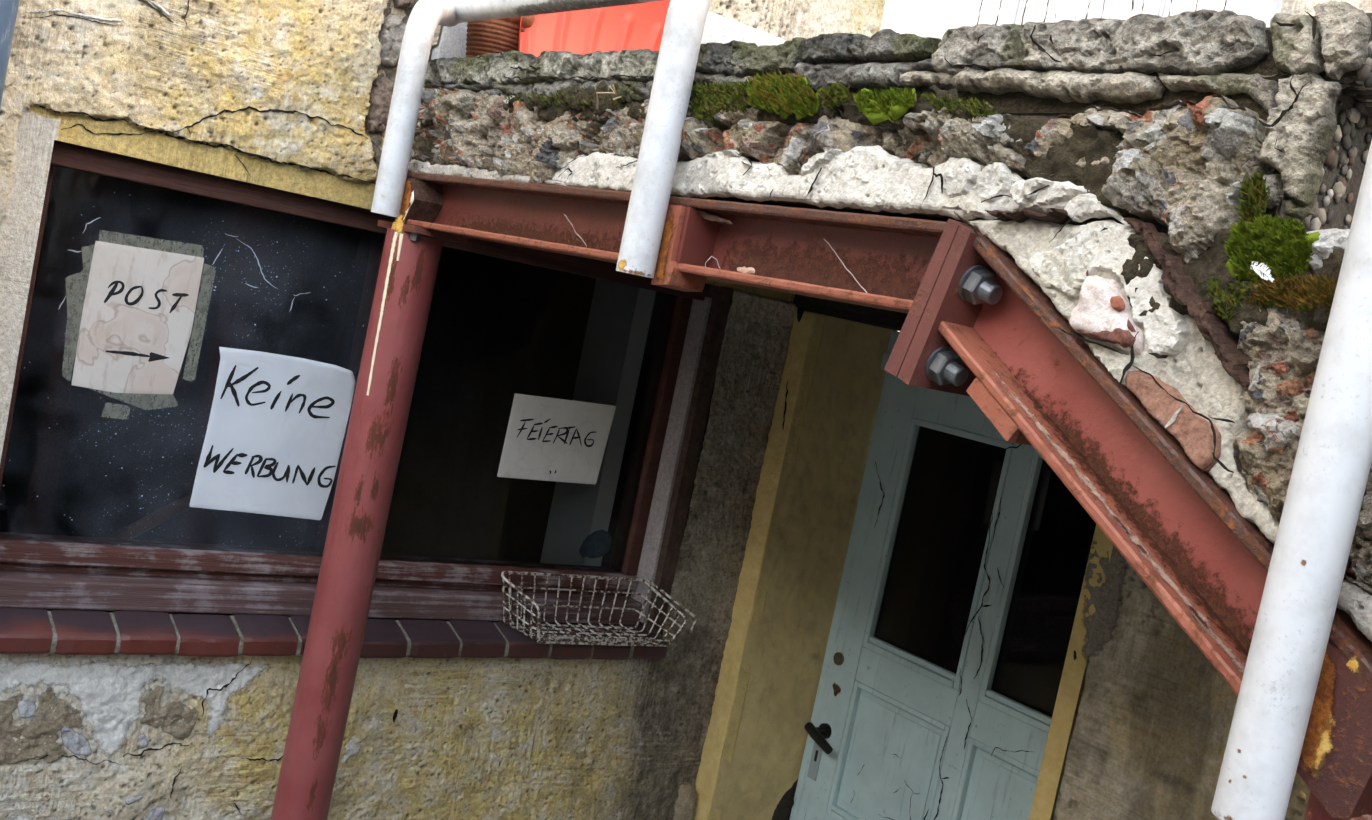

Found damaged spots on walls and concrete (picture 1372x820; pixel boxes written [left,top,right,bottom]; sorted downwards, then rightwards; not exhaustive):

crack [34,104,376,184]
corrosion [387,248,425,308]
corrosion [456,209,675,281]
corrosion [721,233,927,300]
corrosion [346,357,402,543]
crack [1059,326,1235,476]
flaking render [0,685,92,765]
flaking render [135,686,198,751]
corrosion [313,626,351,759]
crack [851,498,1029,820]
peeling [1073,541,1126,662]
corrosion [1301,650,1359,774]